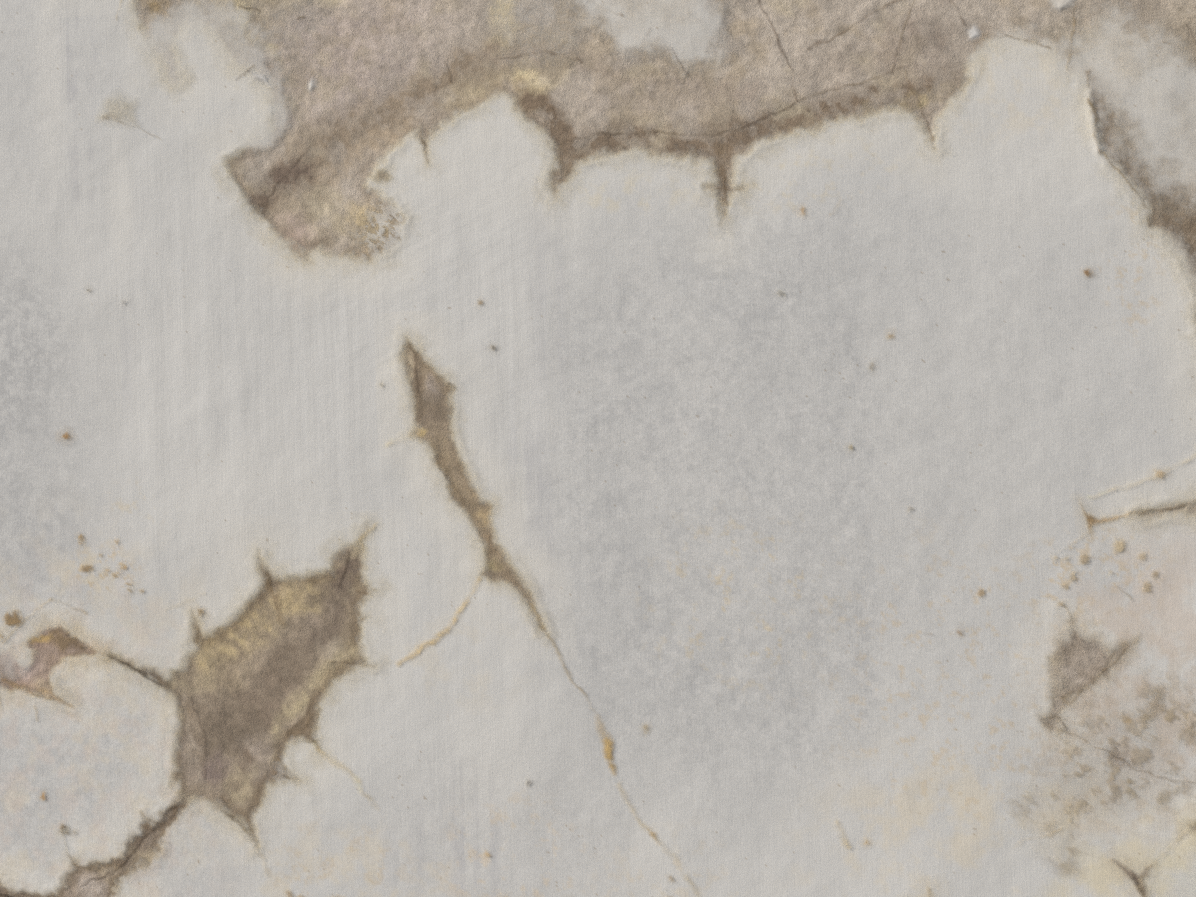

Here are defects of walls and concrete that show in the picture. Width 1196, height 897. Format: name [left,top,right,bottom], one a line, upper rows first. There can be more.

peeling [134,0,1021,262]
crack [400,339,546,631]
flaking render [0,534,374,845]
crack [604,738,614,771]